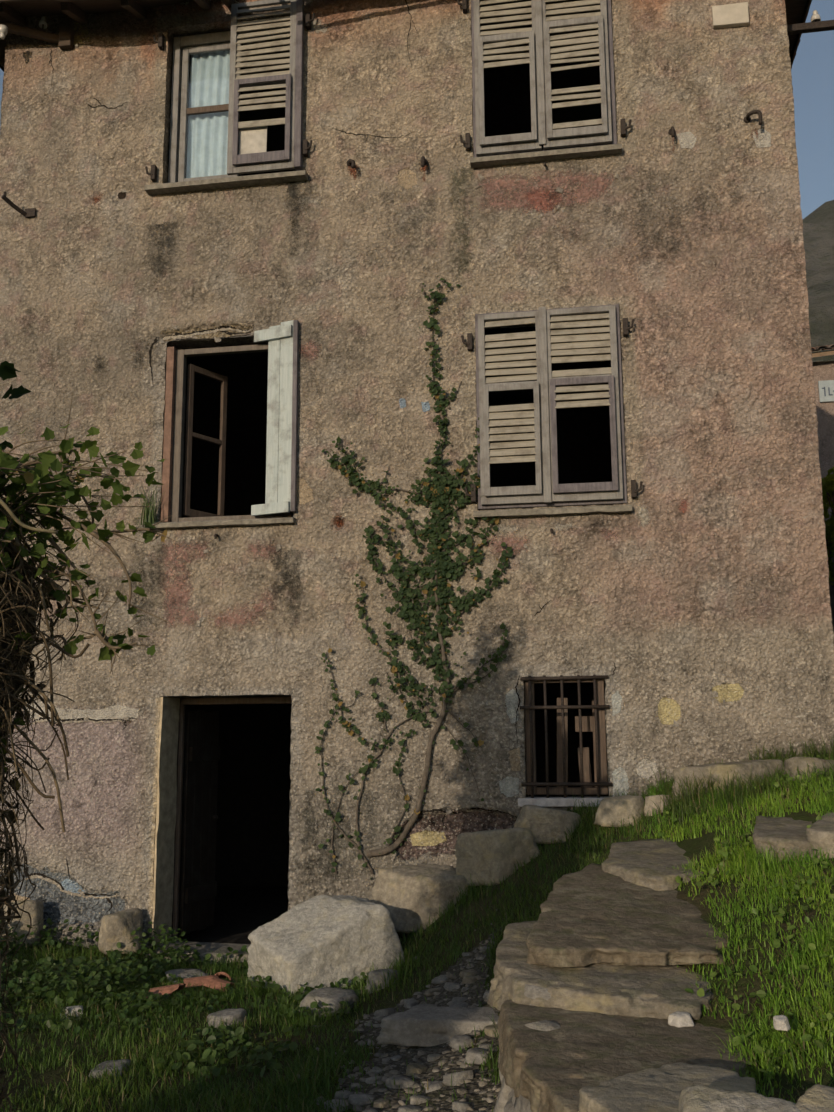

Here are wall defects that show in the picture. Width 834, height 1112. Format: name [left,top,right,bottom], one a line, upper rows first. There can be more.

crack [405,0,416,65]
spalling [0,862,127,928]